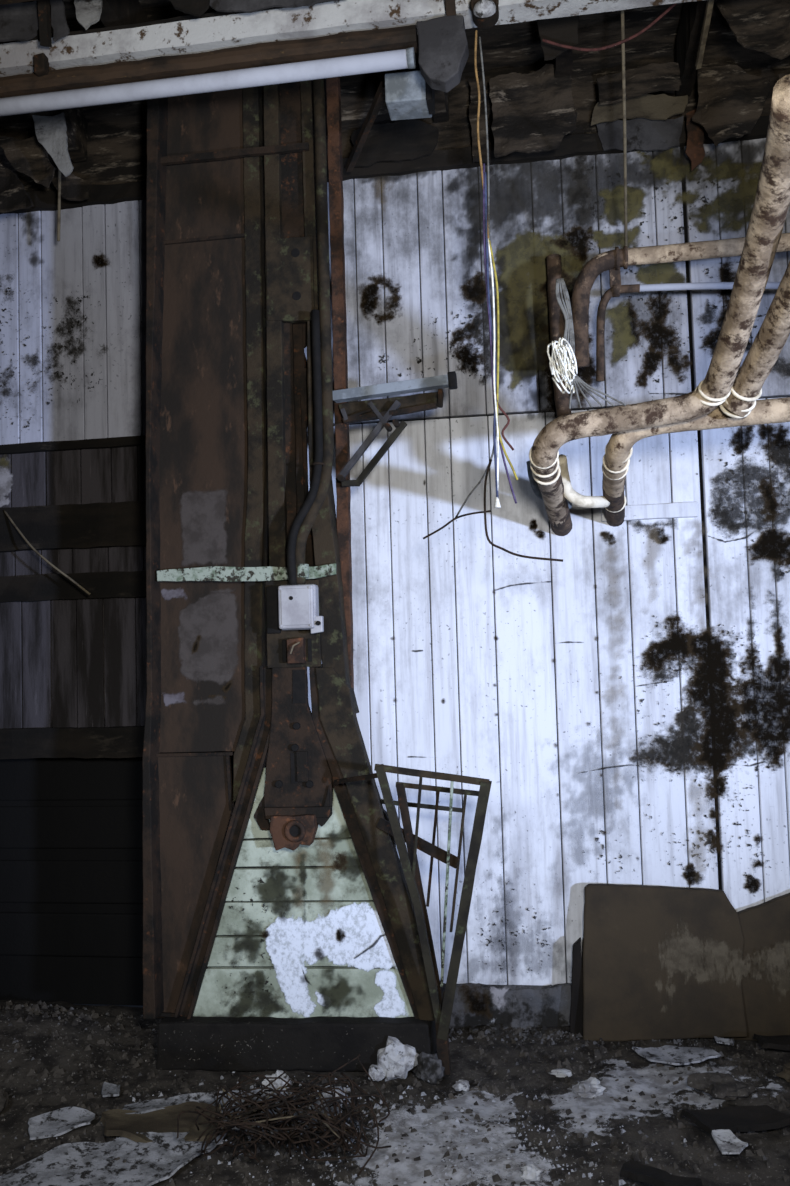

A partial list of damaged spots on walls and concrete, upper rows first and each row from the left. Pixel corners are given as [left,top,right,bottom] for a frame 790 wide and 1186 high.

leakage [360,275,402,324]
leakage [379,140,766,387]
leakage [508,281,557,418]
leakage [569,334,598,409]
leakage [773,357,790,376]
leakage [530,519,545,538]
leakage [601,532,616,545]
leakage [619,424,790,853]
leakage [328,827,363,880]
leakage [216,852,300,1019]
peeling [266,902,408,1018]
leakage [315,949,362,1010]